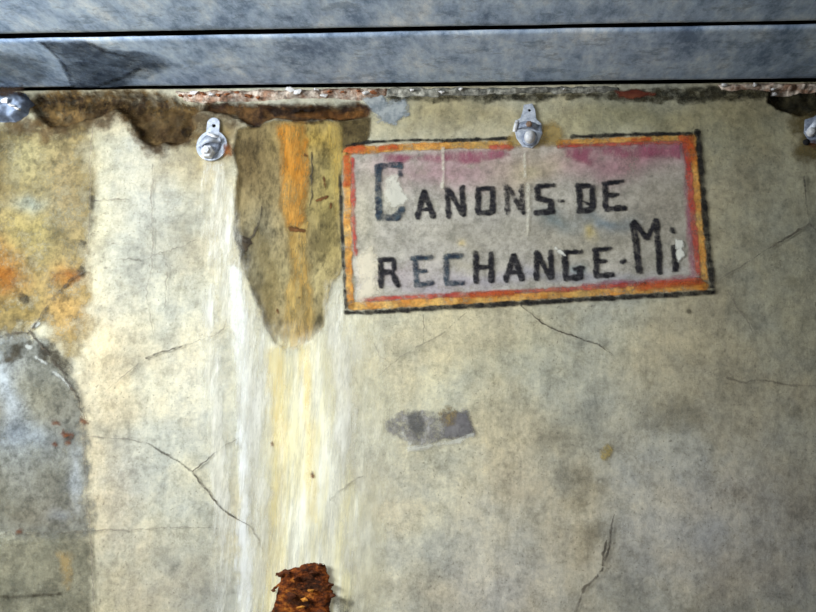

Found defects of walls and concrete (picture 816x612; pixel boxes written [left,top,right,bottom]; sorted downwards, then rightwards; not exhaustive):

crack [757,223,810,256]
crack [6,270,85,418]
water stain [204,166,474,612]
crack [155,448,248,525]
corrosion [271,562,336,612]
crack [579,517,614,603]